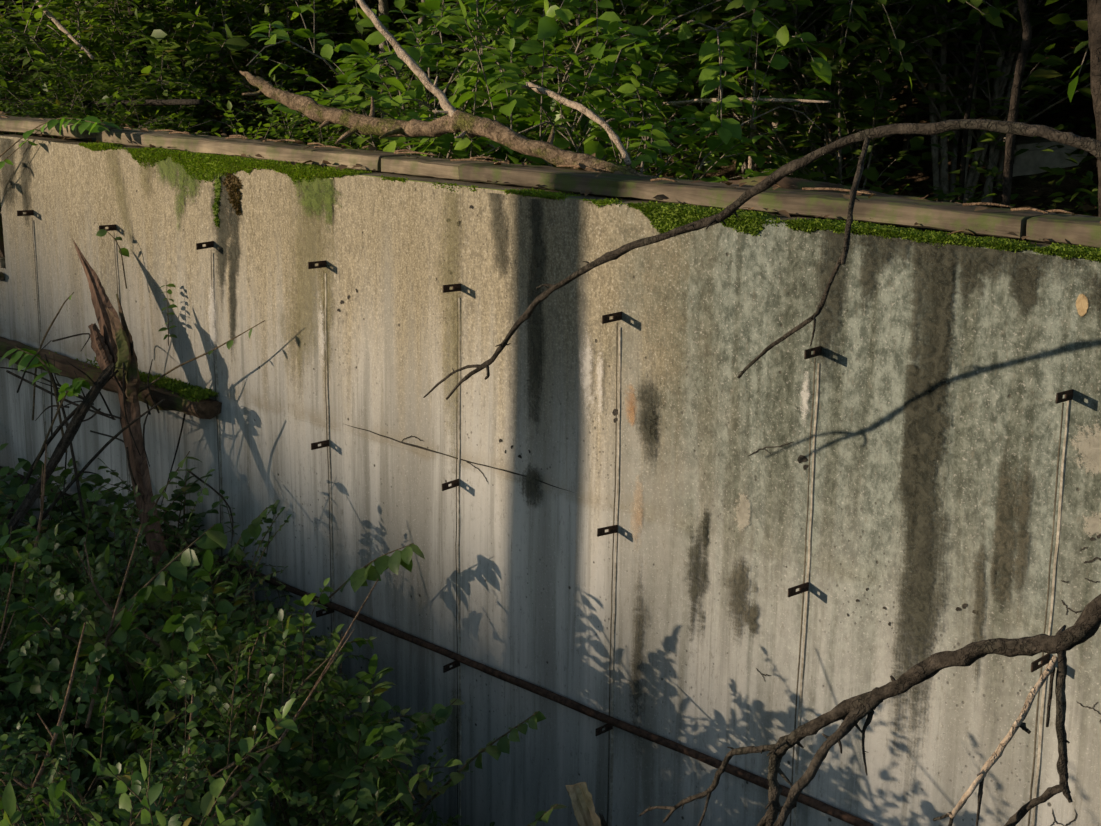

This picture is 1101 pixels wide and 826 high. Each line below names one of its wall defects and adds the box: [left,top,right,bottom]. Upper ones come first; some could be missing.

leakage [295,173,338,227]
leakage [636,381,657,465]
leakage [814,230,1076,680]
leakage [687,508,709,641]
leakage [894,679,928,767]